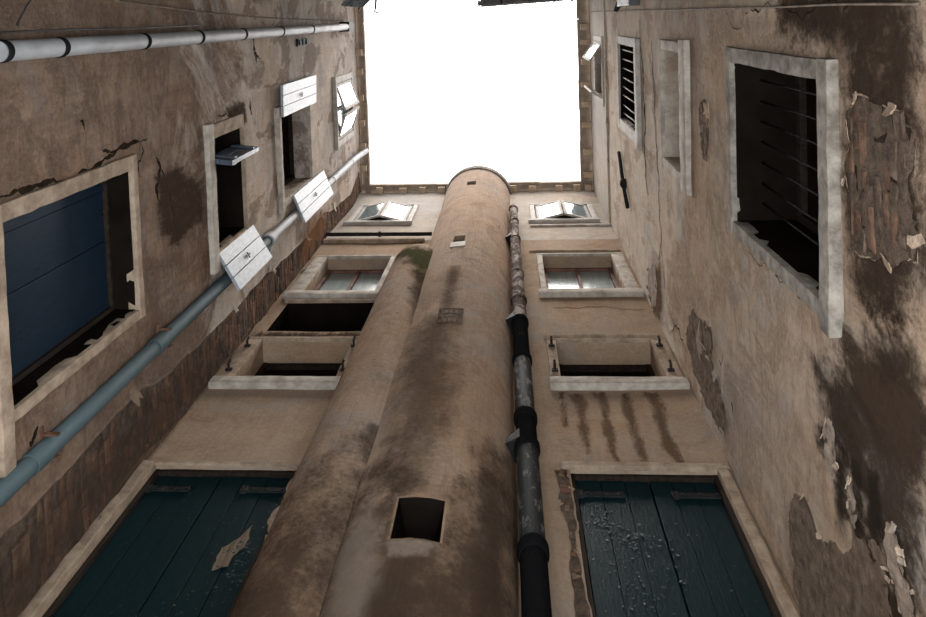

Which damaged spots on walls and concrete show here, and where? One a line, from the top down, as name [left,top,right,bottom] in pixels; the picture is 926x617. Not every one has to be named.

crack [78,116,86,132]
crack [0,137,166,203]
crack [639,20,687,352]
leakage [776,0,926,234]
flaking render [840,91,926,273]
flaking render [0,171,362,617]
leakage [229,449,519,617]
leakage [560,392,619,462]
spalling [554,468,698,617]
spalling [684,307,727,437]
spalling [787,415,919,617]
leakage [813,165,926,617]